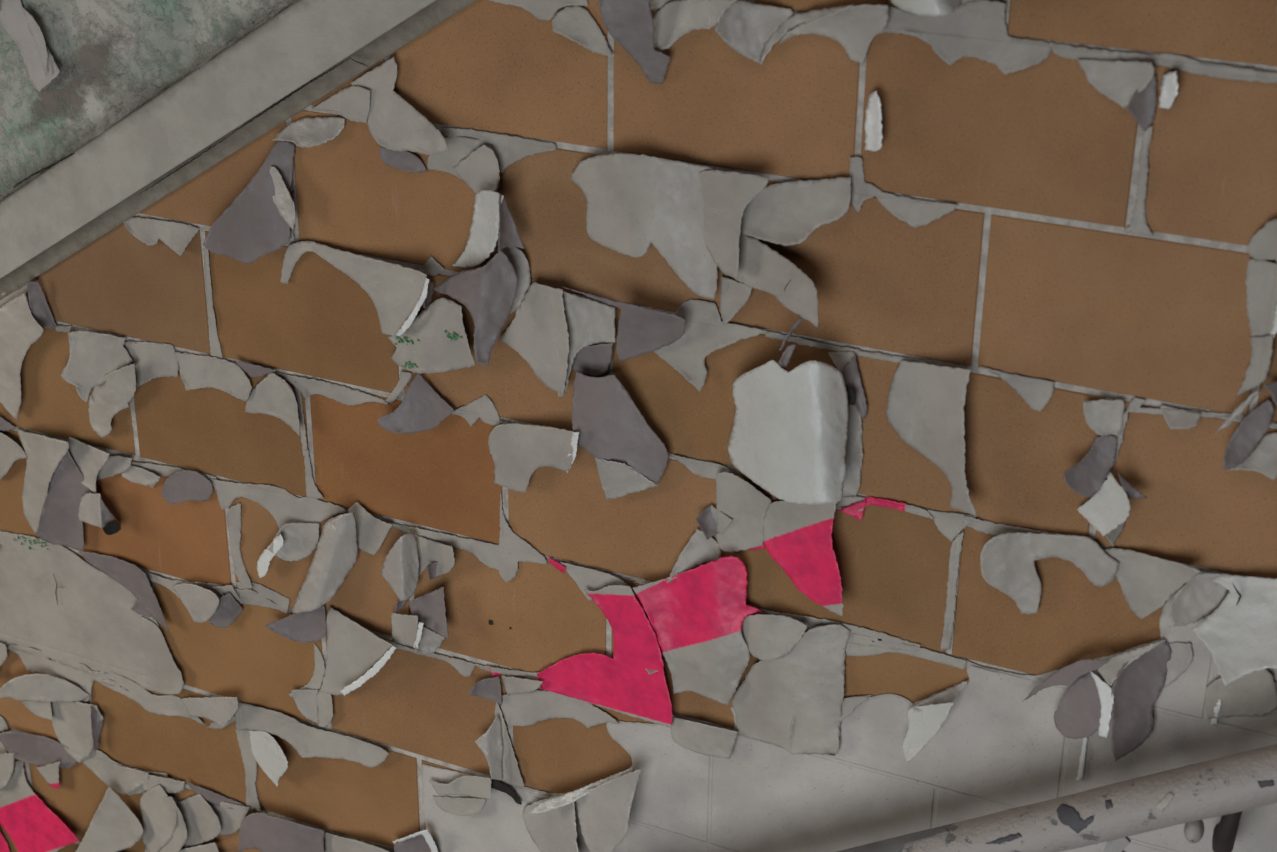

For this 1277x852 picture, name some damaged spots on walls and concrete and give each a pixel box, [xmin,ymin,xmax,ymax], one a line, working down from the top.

peeling [0,0,60,92]
peeling [490,0,1277,236]
peeling [272,57,1277,725]
peeling [0,141,968,852]
peeling [1023,639,1193,780]
peeling [985,833,1022,844]
peeling [1057,799,1113,834]